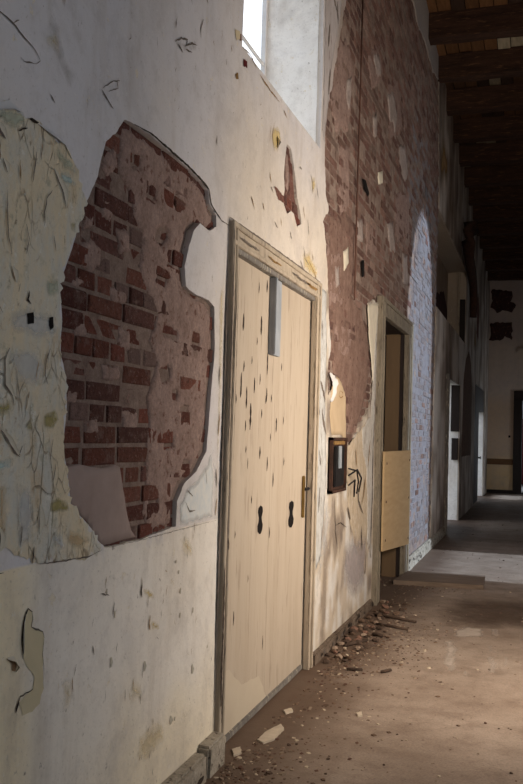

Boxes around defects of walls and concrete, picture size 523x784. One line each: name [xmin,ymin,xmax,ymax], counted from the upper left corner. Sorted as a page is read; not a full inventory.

flaking render [270,128,309,231]
spalling [0,100,228,564]
flaking render [311,0,447,574]
spalling [489,289,516,341]
peeling [7,608,44,716]